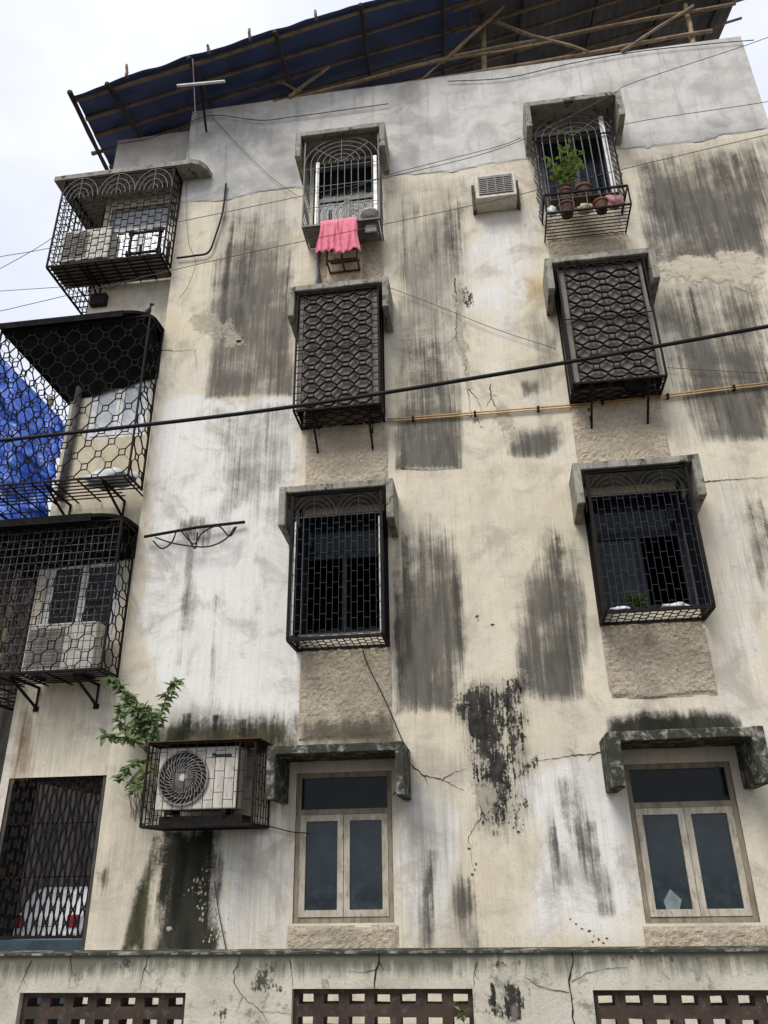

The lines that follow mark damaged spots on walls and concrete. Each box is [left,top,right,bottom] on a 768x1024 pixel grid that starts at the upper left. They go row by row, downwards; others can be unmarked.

water stain [641,151,768,260]
water stain [209,218,292,397]
water stain [396,339,484,469]
crack [449,278,496,411]
water stain [664,288,768,440]
water stain [394,535,586,835]
crack [411,764,489,861]
crack [536,749,601,761]
water stain [156,830,228,950]
crack [349,950,383,987]
mould [485,979,530,1021]
crack [525,952,627,1024]